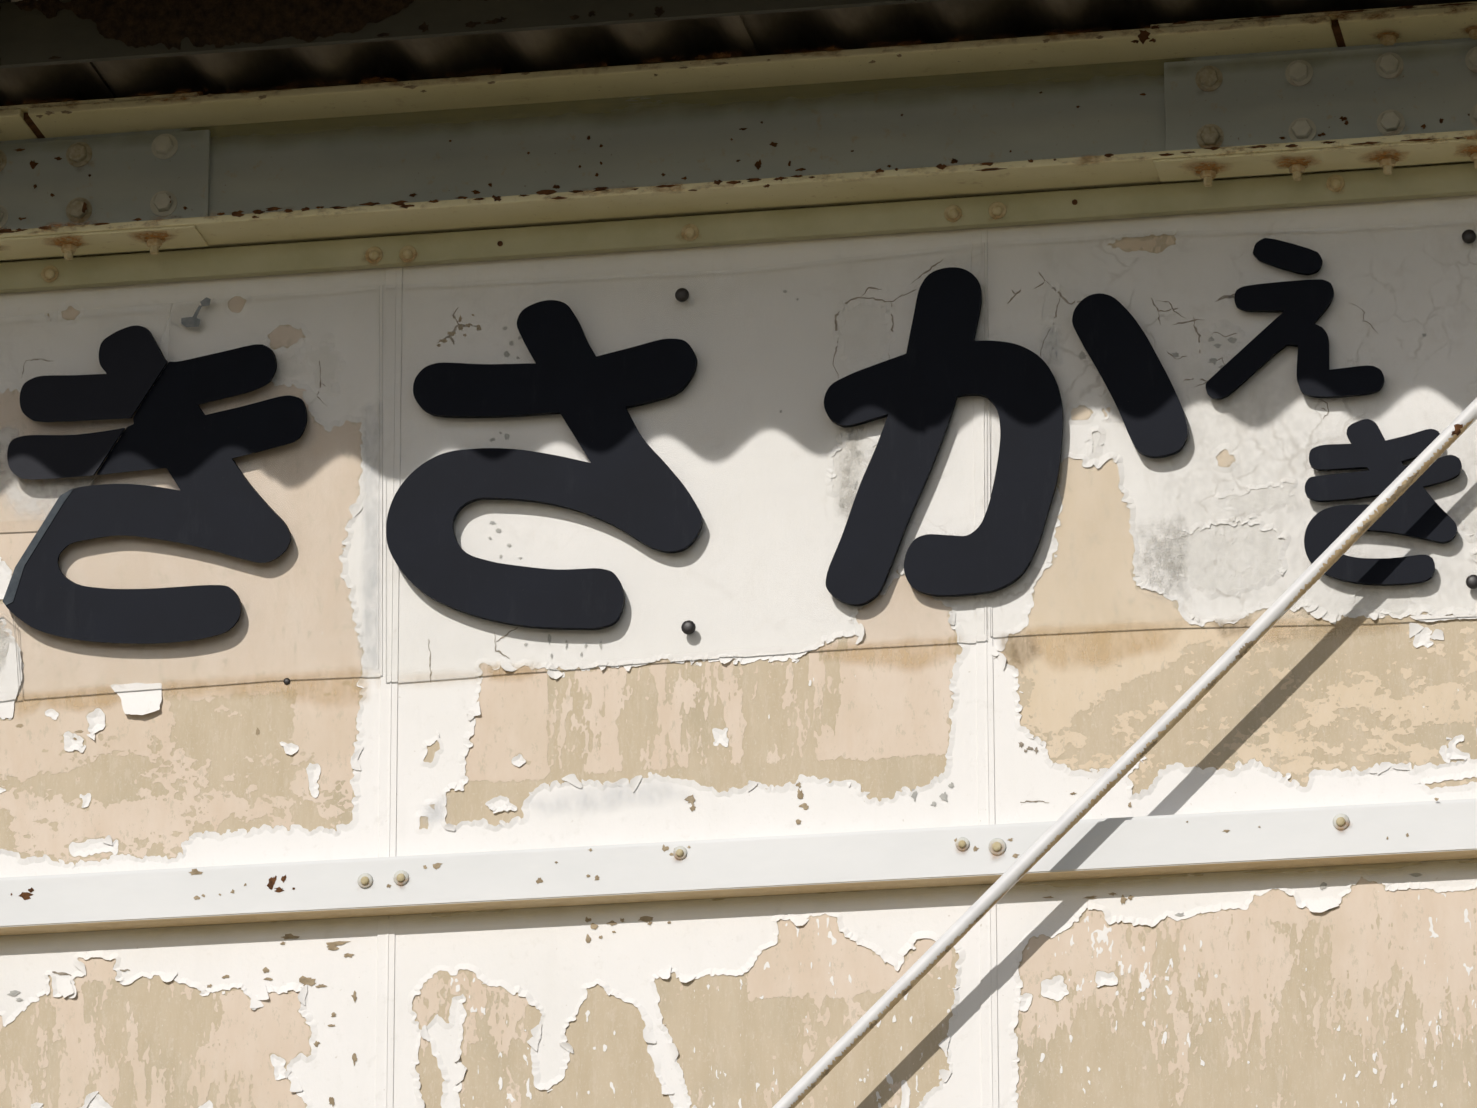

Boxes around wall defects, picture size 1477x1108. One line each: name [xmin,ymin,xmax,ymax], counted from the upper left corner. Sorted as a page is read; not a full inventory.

rust [15,0,414,50]
rust [974,150,1012,171]
rust [1159,137,1311,174]
rust [1317,118,1477,161]
peeling [825,422,879,516]
peeling [0,318,370,869]
peeling [989,386,1477,807]
peeling [413,563,970,835]
rust [267,875,295,892]
peeling [0,949,336,1108]
peeling [407,909,966,1108]
peeling [1007,871,1477,1108]